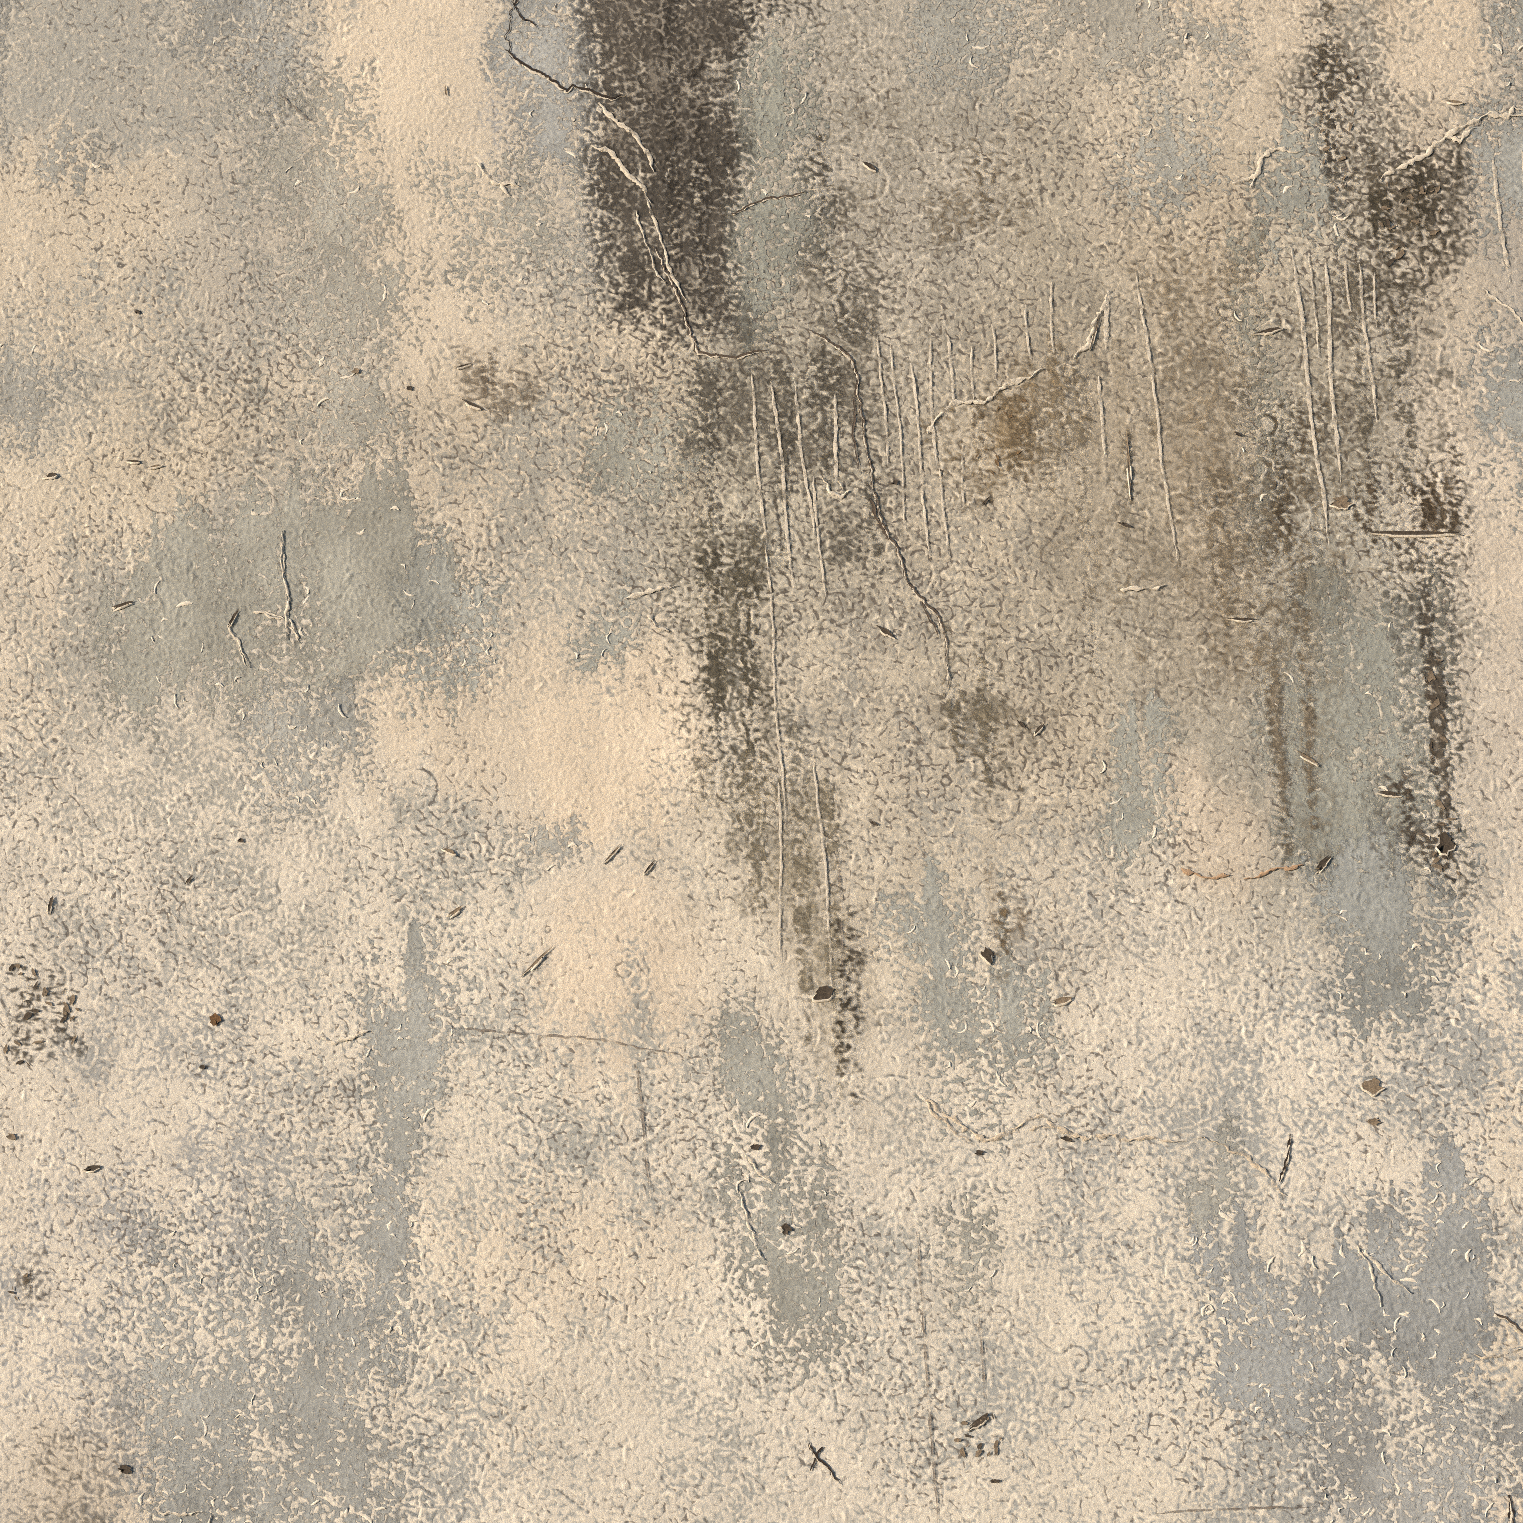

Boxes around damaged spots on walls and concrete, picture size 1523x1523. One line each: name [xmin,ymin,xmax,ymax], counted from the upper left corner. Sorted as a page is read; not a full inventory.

crack [475,161,518,196]
crack [504,0,769,360]
crack [1380,105,1523,181]
leakage [573,0,1132,1098]
leakage [1136,1,1474,889]